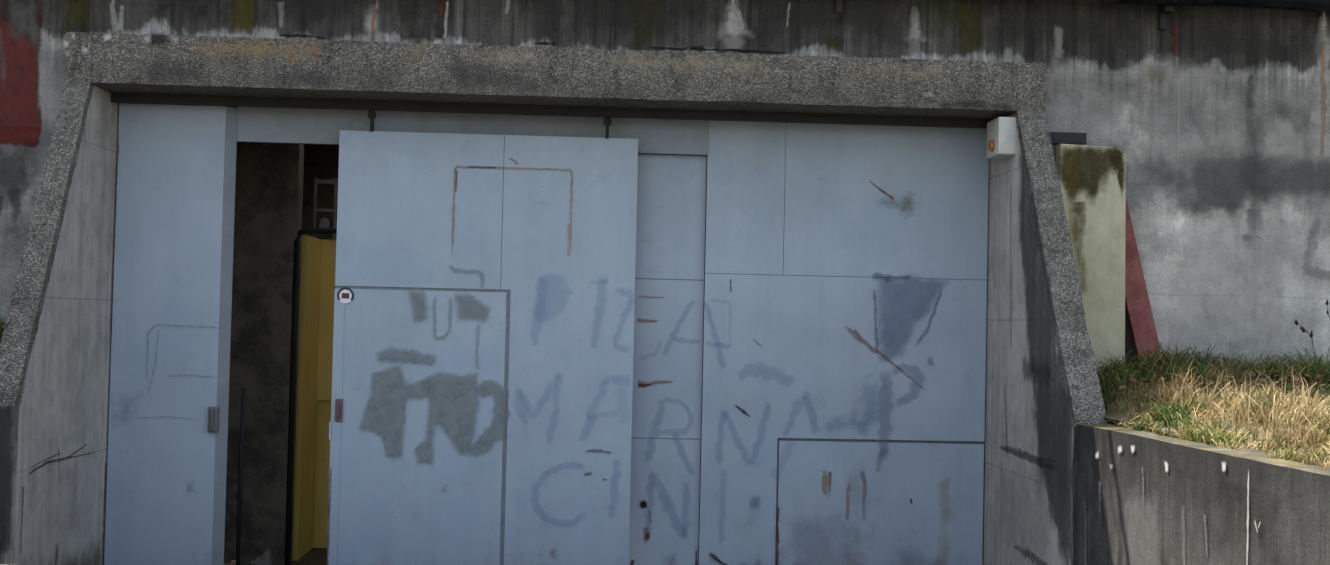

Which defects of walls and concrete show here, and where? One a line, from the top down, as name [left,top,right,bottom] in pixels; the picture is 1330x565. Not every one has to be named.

water stain [366,0,378,35]
water stain [721,0,746,38]
water stain [1195,12,1330,233]
water stain [0,152,28,211]